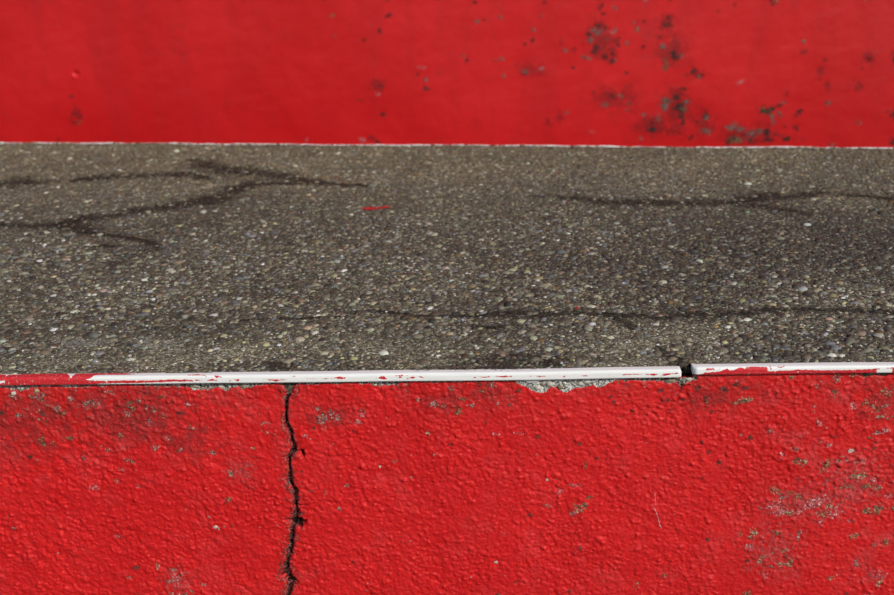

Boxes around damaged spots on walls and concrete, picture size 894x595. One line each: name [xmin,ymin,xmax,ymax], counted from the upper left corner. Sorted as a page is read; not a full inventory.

spalling [0,383,275,422]
spalling [296,364,697,407]
crack [277,367,305,595]